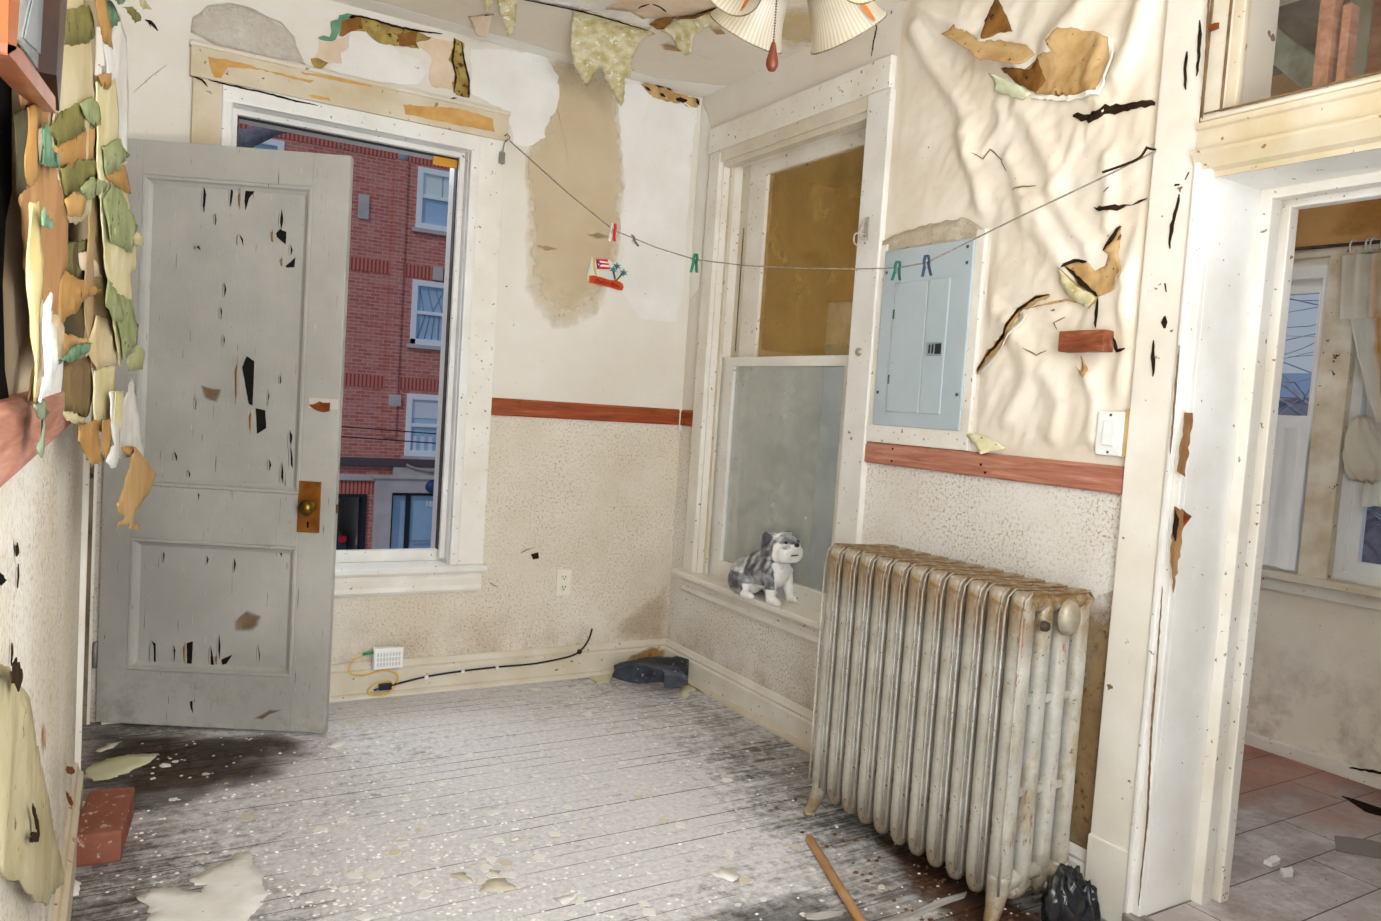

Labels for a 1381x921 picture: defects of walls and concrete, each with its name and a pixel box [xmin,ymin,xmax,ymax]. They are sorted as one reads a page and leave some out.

peeling [208,0,725,132]
crack [526,0,717,31]
crack [973,149,1036,190]
spalling [0,77,12,399]